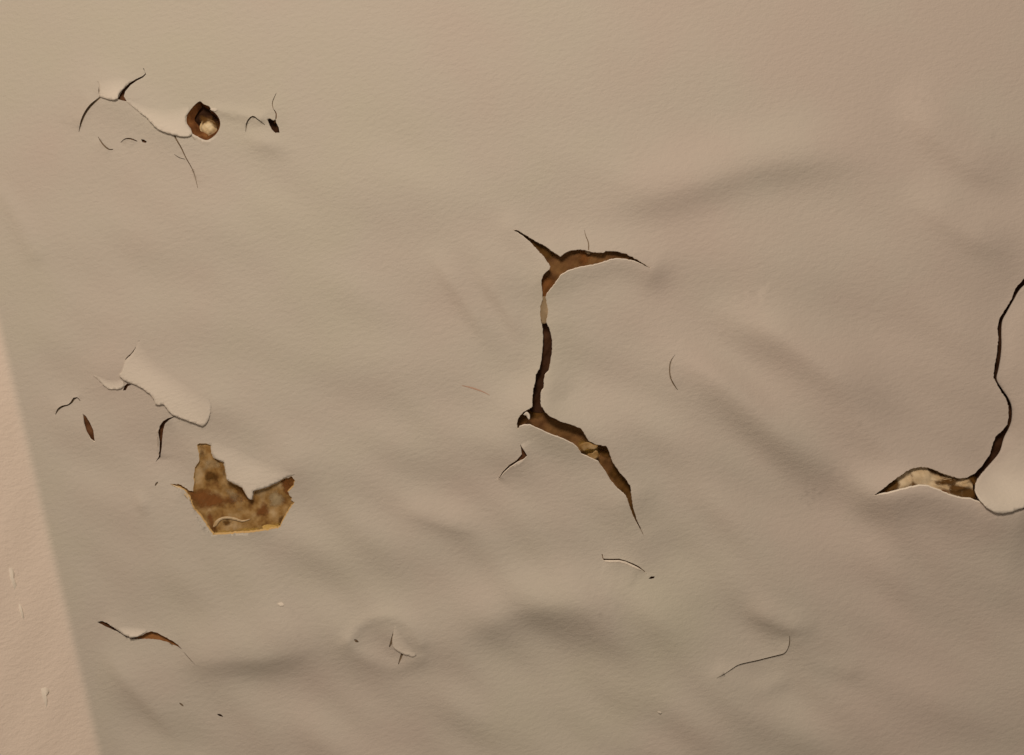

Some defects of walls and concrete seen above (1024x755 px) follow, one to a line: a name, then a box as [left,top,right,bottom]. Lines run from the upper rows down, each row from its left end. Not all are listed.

peeling [79,68,217,188]
peeling [83,414,95,442]
peeling [94,341,211,461]
crack [498,230,650,534]
crack [873,279,1024,513]
spalling [171,442,295,535]
crack [601,554,655,579]
crack [723,636,790,675]